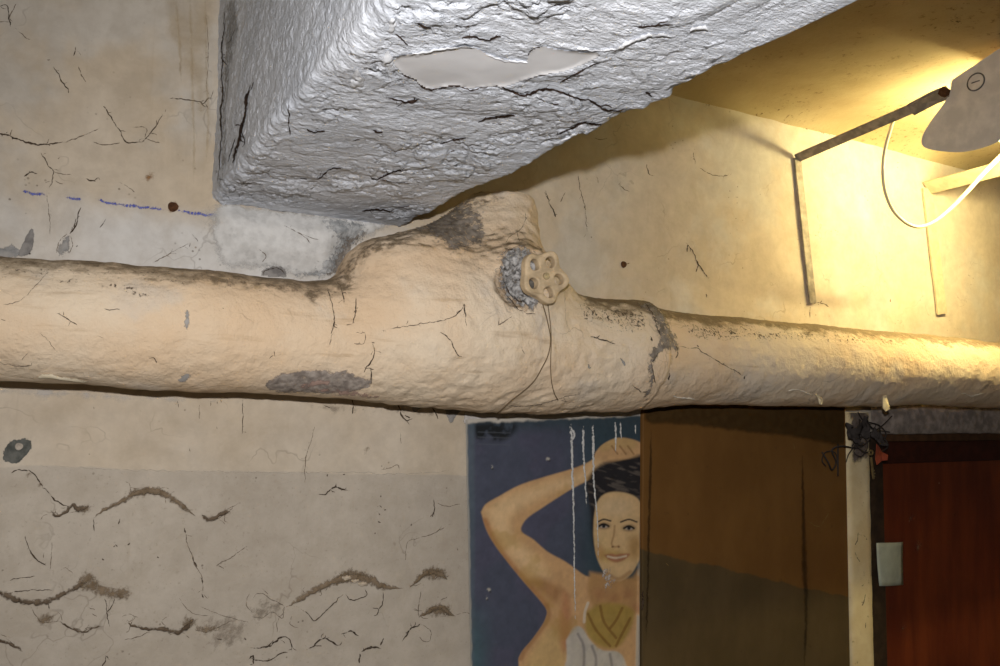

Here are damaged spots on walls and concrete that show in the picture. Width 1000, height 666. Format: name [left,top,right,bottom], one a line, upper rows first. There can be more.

crack [0,8,254,247]
crack [386,46,623,152]
spalling [393,33,673,88]
leakage [416,200,486,250]
spalling [3,438,32,463]
crack [182,528,432,665]